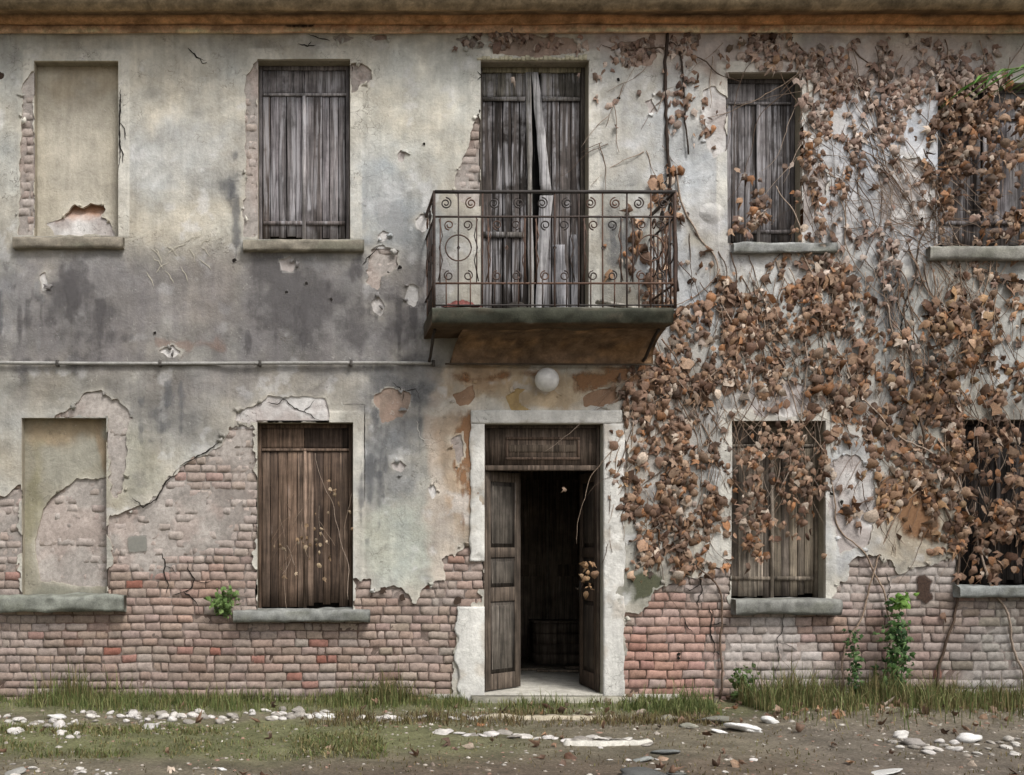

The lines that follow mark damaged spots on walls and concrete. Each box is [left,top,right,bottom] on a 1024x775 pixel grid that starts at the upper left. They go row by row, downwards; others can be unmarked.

flaking render [350,61,372,93]
flaking render [15,72,115,236]
crack [117,90,126,172]
flaking render [241,60,258,239]
flaking render [452,115,480,206]
water stain [46,269,113,340]
water stain [253,252,345,343]
flaking render [366,231,403,316]
crack [269,399,320,421]
crack [162,554,213,614]
flaking render [0,388,483,700]
flaking render [623,453,1024,700]